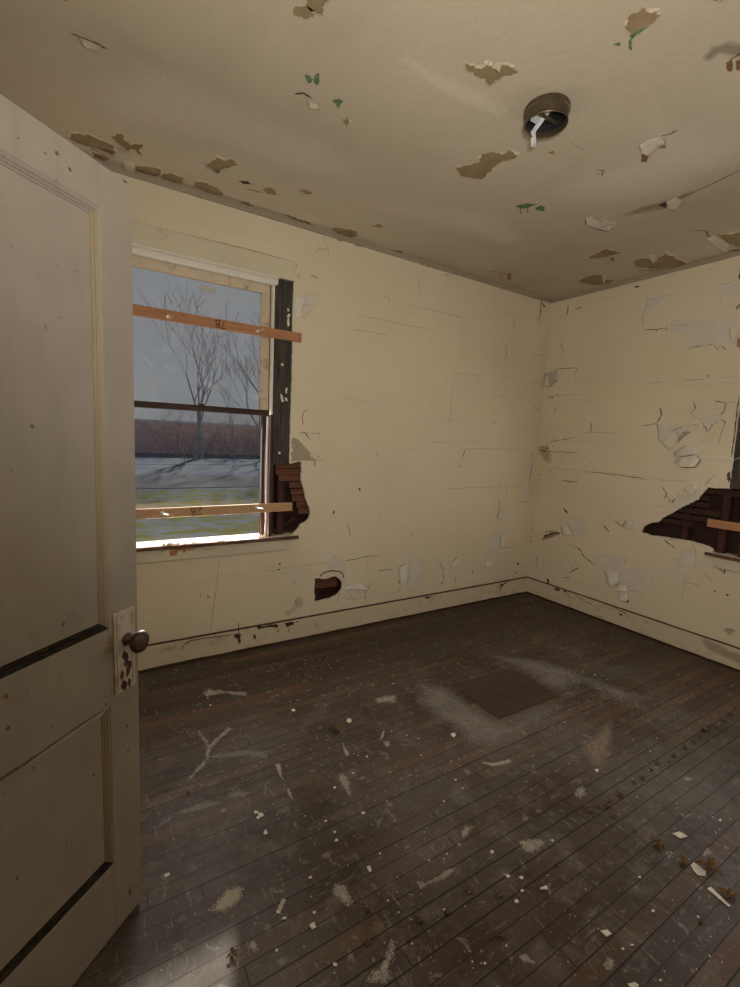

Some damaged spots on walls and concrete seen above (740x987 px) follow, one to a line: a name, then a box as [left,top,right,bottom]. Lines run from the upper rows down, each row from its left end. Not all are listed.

peeling [291,0,331,20]
peeling [614,7,662,50]
peeling [461,59,518,87]
peeling [67,131,240,196]
peeling [453,150,521,180]
peeling [239,181,278,207]
crack [623,170,740,214]
peeling [283,214,362,247]
peeling [690,230,740,253]
peeling [175,231,323,535]
peeling [641,398,740,552]
peeling [314,570,370,603]